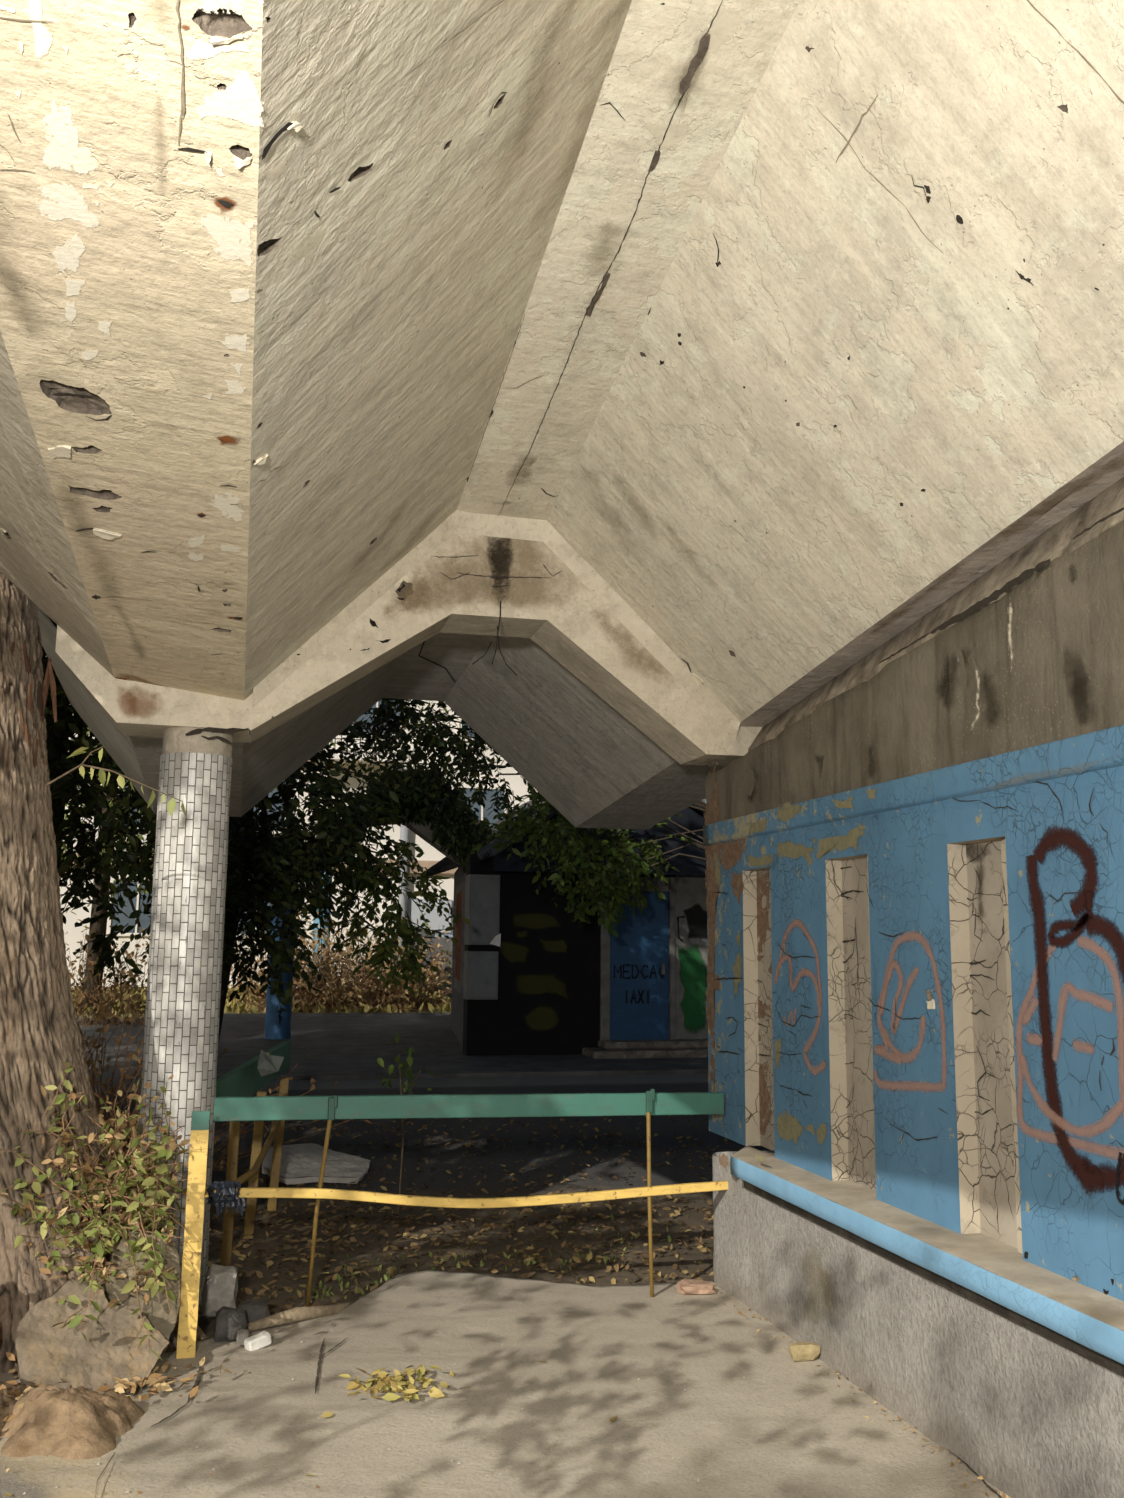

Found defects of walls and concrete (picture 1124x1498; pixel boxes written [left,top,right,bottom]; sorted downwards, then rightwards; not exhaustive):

peeling [182,0,271,129]
crack [1027,0,1124,104]
peeling [35,96,114,322]
spalling [215,144,252,177]
crack [467,0,723,516]
crack [816,95,963,249]
spalling [39,380,112,421]
damp [401,538,544,605]
damp [940,654,997,727]
peeling [705,788,877,1092]
crack [714,866,921,1109]
crack [889,868,995,1143]